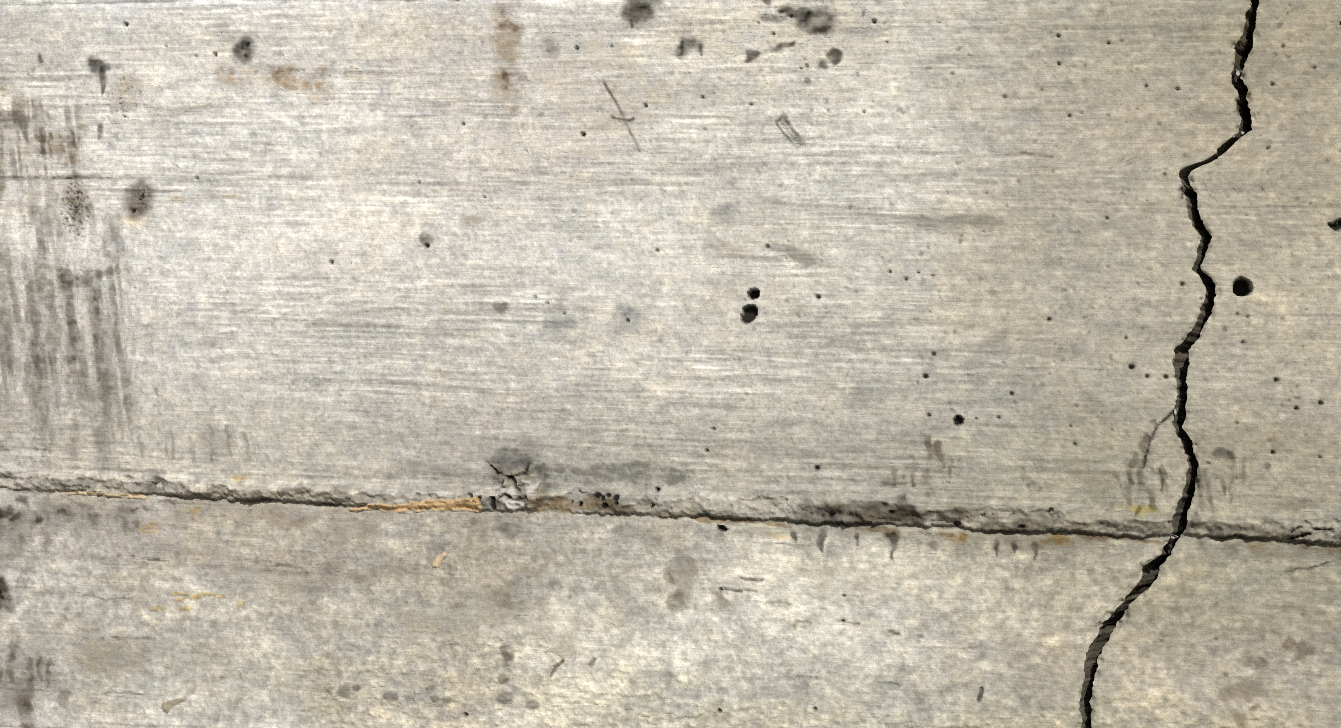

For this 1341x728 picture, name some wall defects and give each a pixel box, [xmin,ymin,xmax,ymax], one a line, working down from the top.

water stain [0,48,642,672]
crack [1079,0,1259,728]
water stain [552,457,723,490]
water stain [879,433,955,501]
water stain [1061,430,1171,517]
water stain [542,513,1137,629]